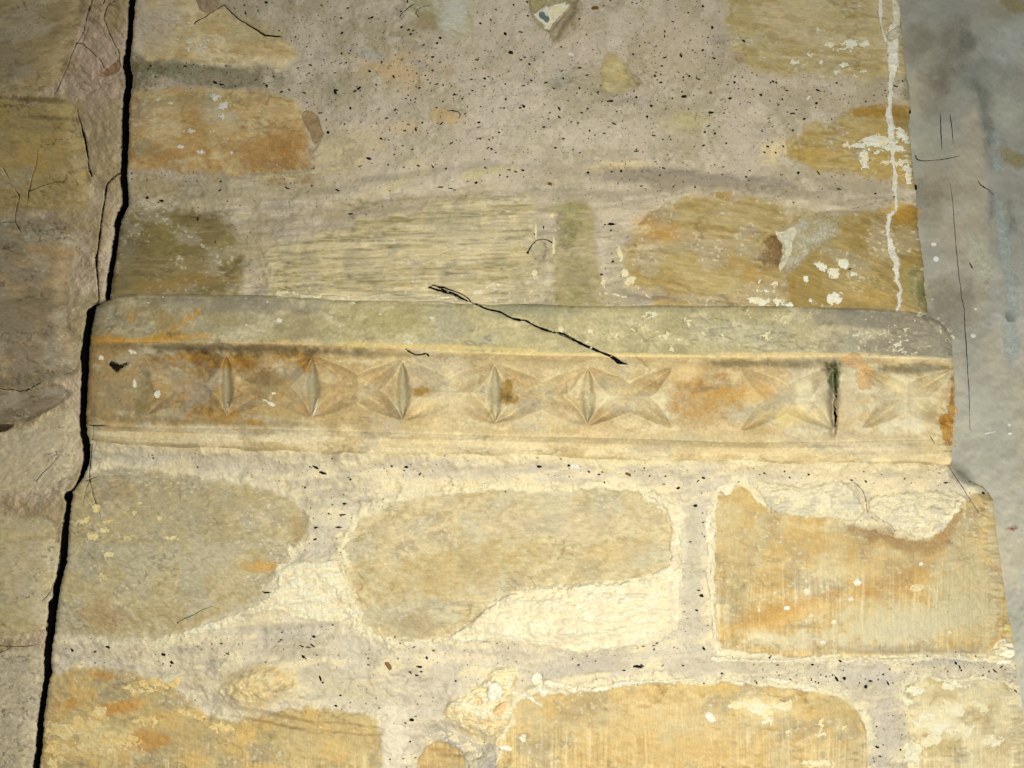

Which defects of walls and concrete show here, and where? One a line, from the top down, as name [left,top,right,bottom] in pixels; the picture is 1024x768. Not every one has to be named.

crack [0,0,136,768]
crack [428,285,628,366]
damp [824,39,870,78]
damp [842,0,955,356]